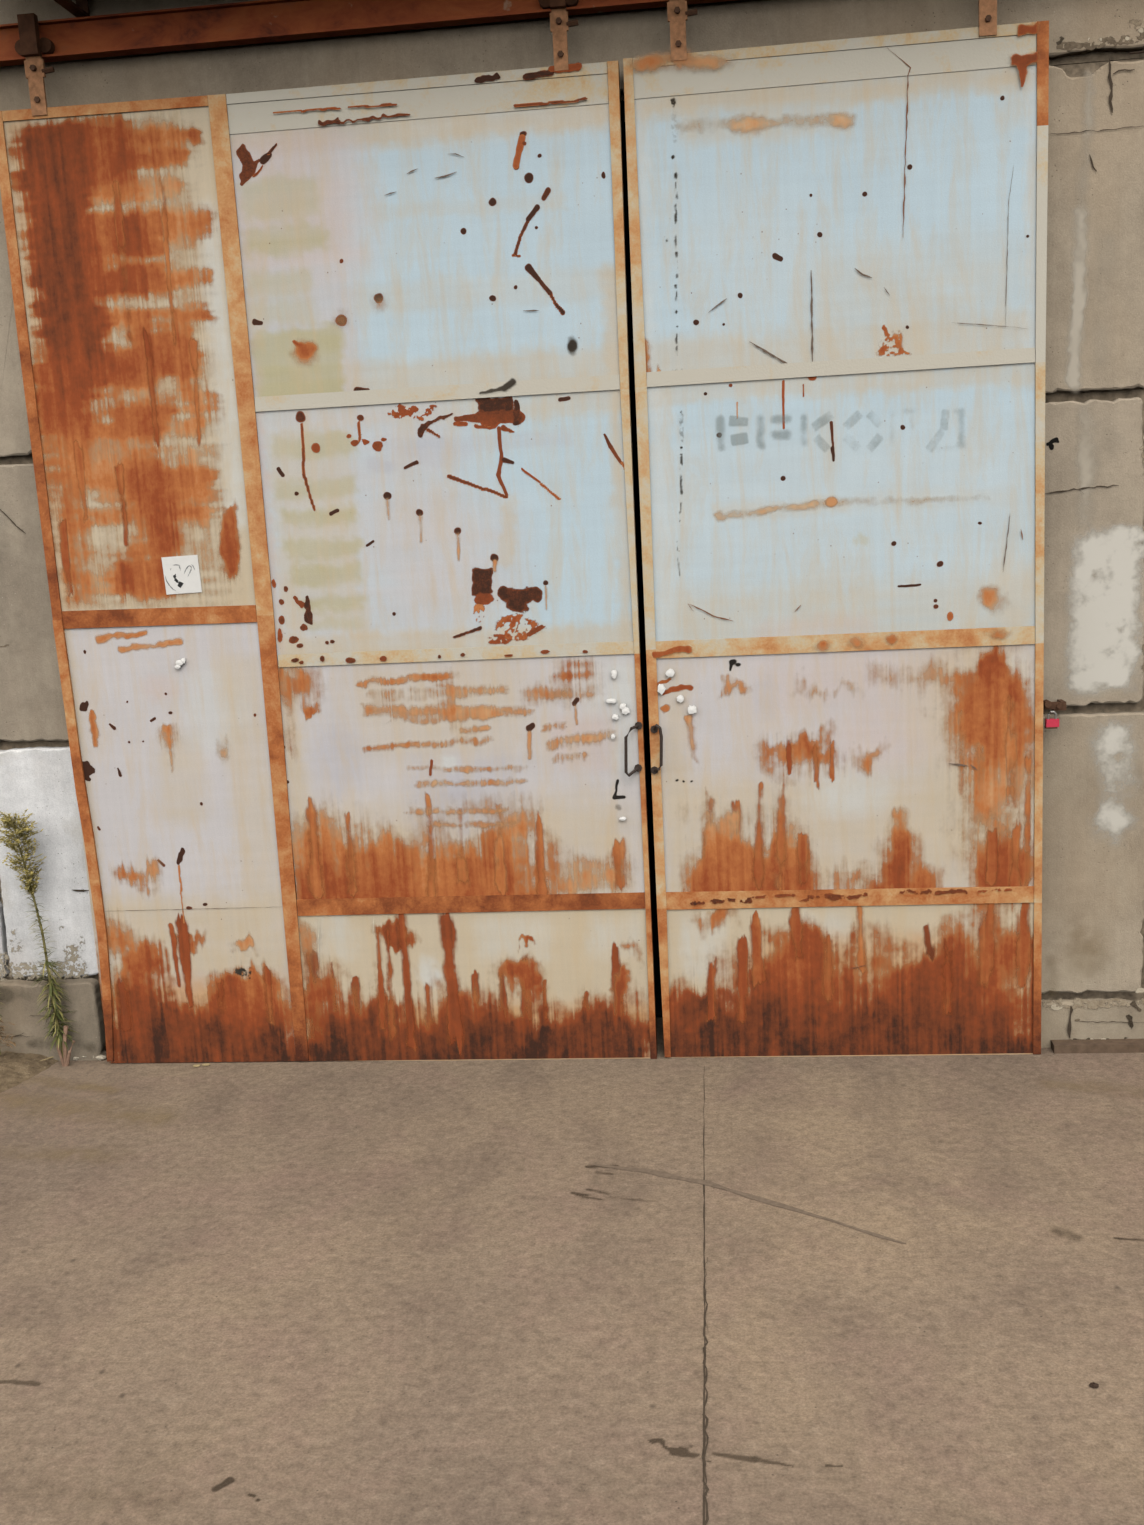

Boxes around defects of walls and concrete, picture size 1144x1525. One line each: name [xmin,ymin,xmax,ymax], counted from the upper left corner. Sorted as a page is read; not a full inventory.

corrosion [8,113,240,605]
corrosion [277,411,339,516]
corrosion [447,426,561,500]
corrosion [603,434,624,468]
corrosion [982,588,998,609]
corrosion [83,631,183,654]
corrosion [652,646,692,658]
corrosion [657,678,695,750]
corrosion [89,661,650,1063]
corrosion [669,631,1035,1057]
crack [701,1257,709,1525]